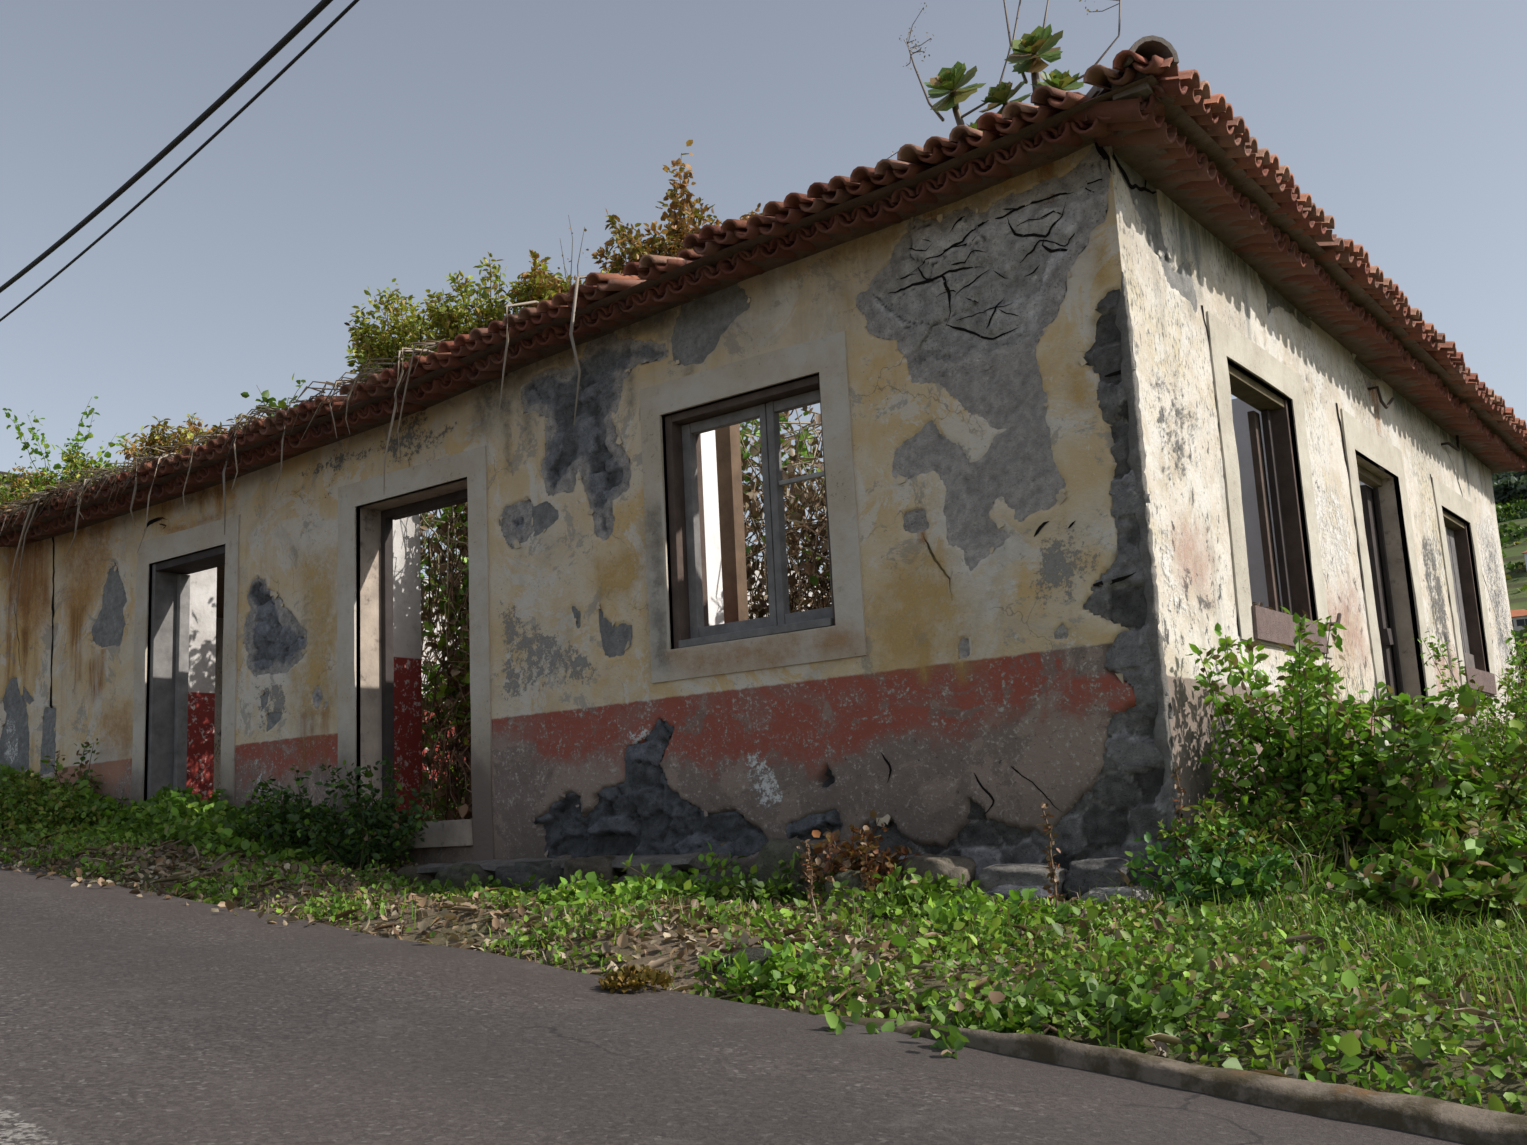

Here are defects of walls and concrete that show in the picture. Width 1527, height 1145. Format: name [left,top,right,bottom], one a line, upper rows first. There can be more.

crack [888,142,1157,340]
flaking render [498,284,751,549]
flaking render [856,143,1197,571]
flaking render [90,562,127,648]
flaking render [243,574,308,732]
peeling [497,602,633,700]
flaking render [860,289,1200,885]
flaking render [0,677,56,774]
flaking render [532,719,768,858]
peeling [745,752,782,807]
flaking render [786,810,843,846]